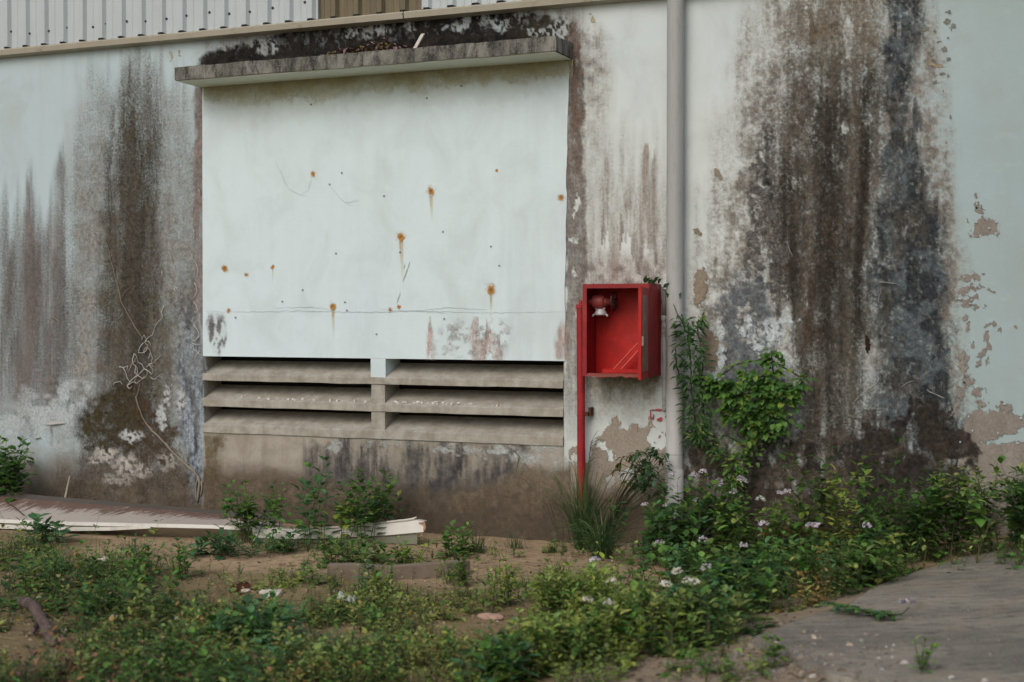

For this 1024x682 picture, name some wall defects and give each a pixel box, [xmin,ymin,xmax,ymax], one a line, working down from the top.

damp [0,59,227,490]
damp [200,9,666,399]
peeling [568,416,666,542]
peeling [693,267,708,308]
damp [688,0,982,548]
peeling [966,193,1000,240]
peeling [949,271,1024,510]